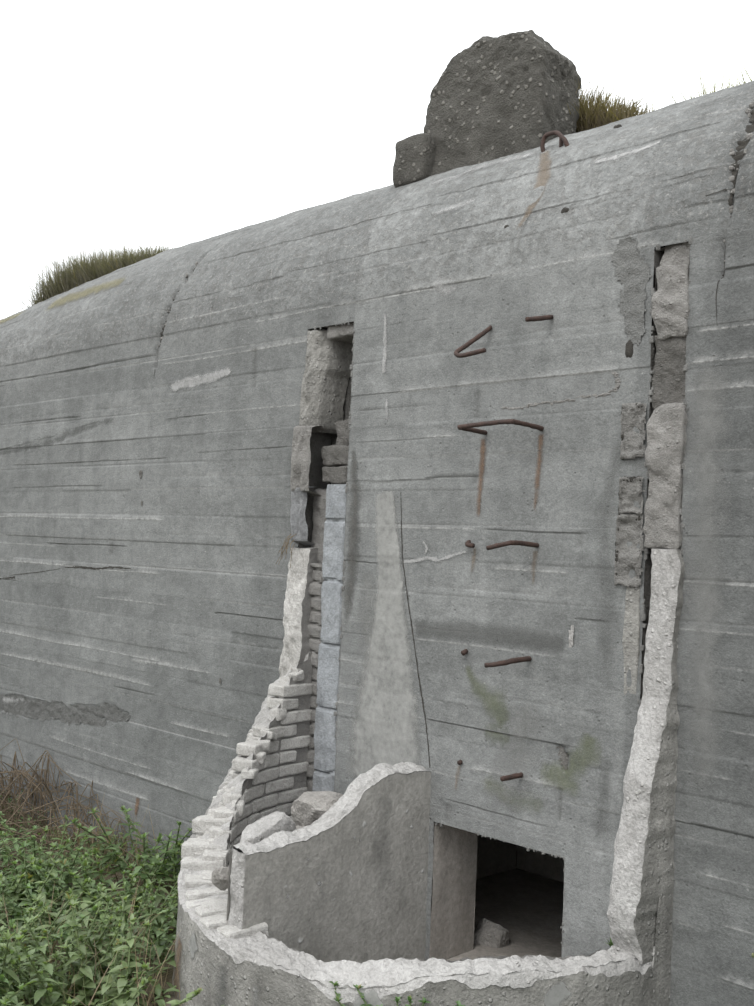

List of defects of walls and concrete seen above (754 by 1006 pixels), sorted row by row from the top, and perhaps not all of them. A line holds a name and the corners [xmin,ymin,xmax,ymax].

crack [705,101,754,318]
crack [158,262,198,347]
spalling [611,237,656,345]
spalling [279,548,310,678]
spalling [0,693,130,727]
spalling [607,509,685,964]
spalling [230,762,431,856]